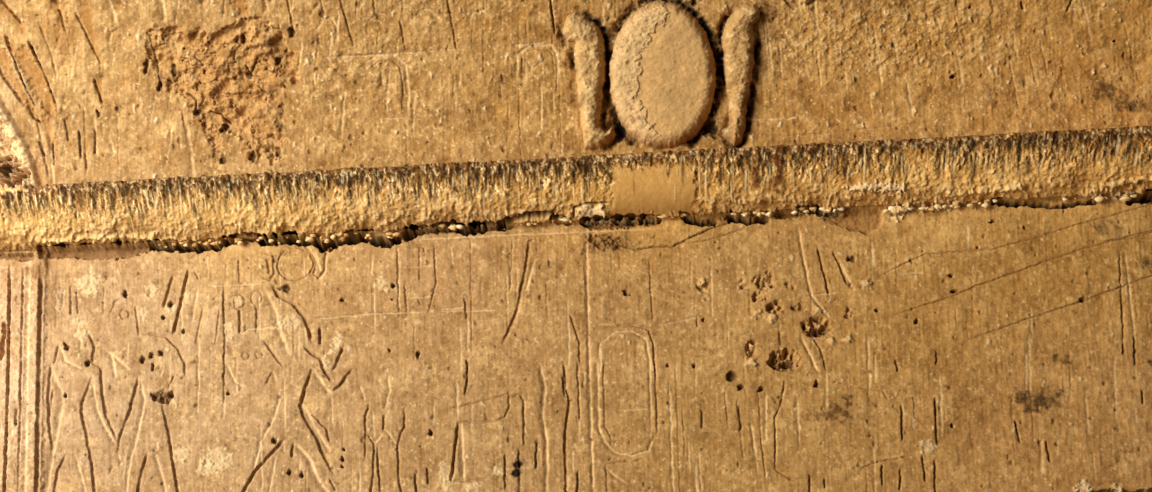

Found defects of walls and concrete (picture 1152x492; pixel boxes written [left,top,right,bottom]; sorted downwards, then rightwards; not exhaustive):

spalling [143,16,297,167]
spalling [734,275,833,339]
spalling [746,342,804,374]